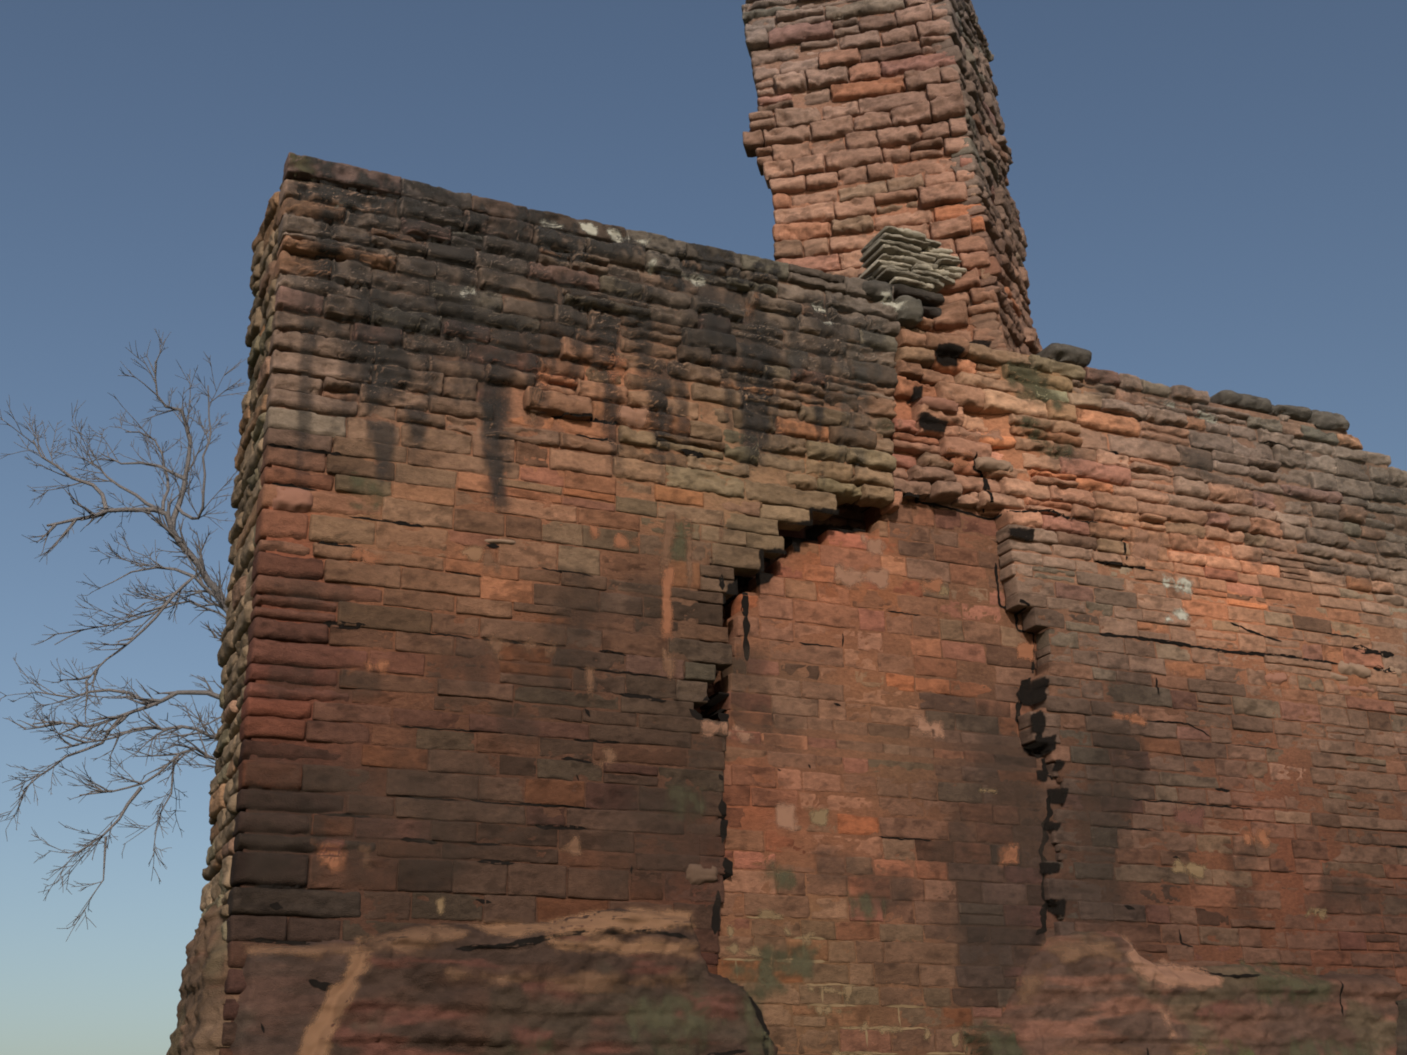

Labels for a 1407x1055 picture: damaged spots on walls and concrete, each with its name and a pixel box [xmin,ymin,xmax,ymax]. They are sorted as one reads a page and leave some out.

water stain [295,156,800,497]
water stain [808,302,883,408]
crack [799,634,844,647]
crack [994,563,1053,935]